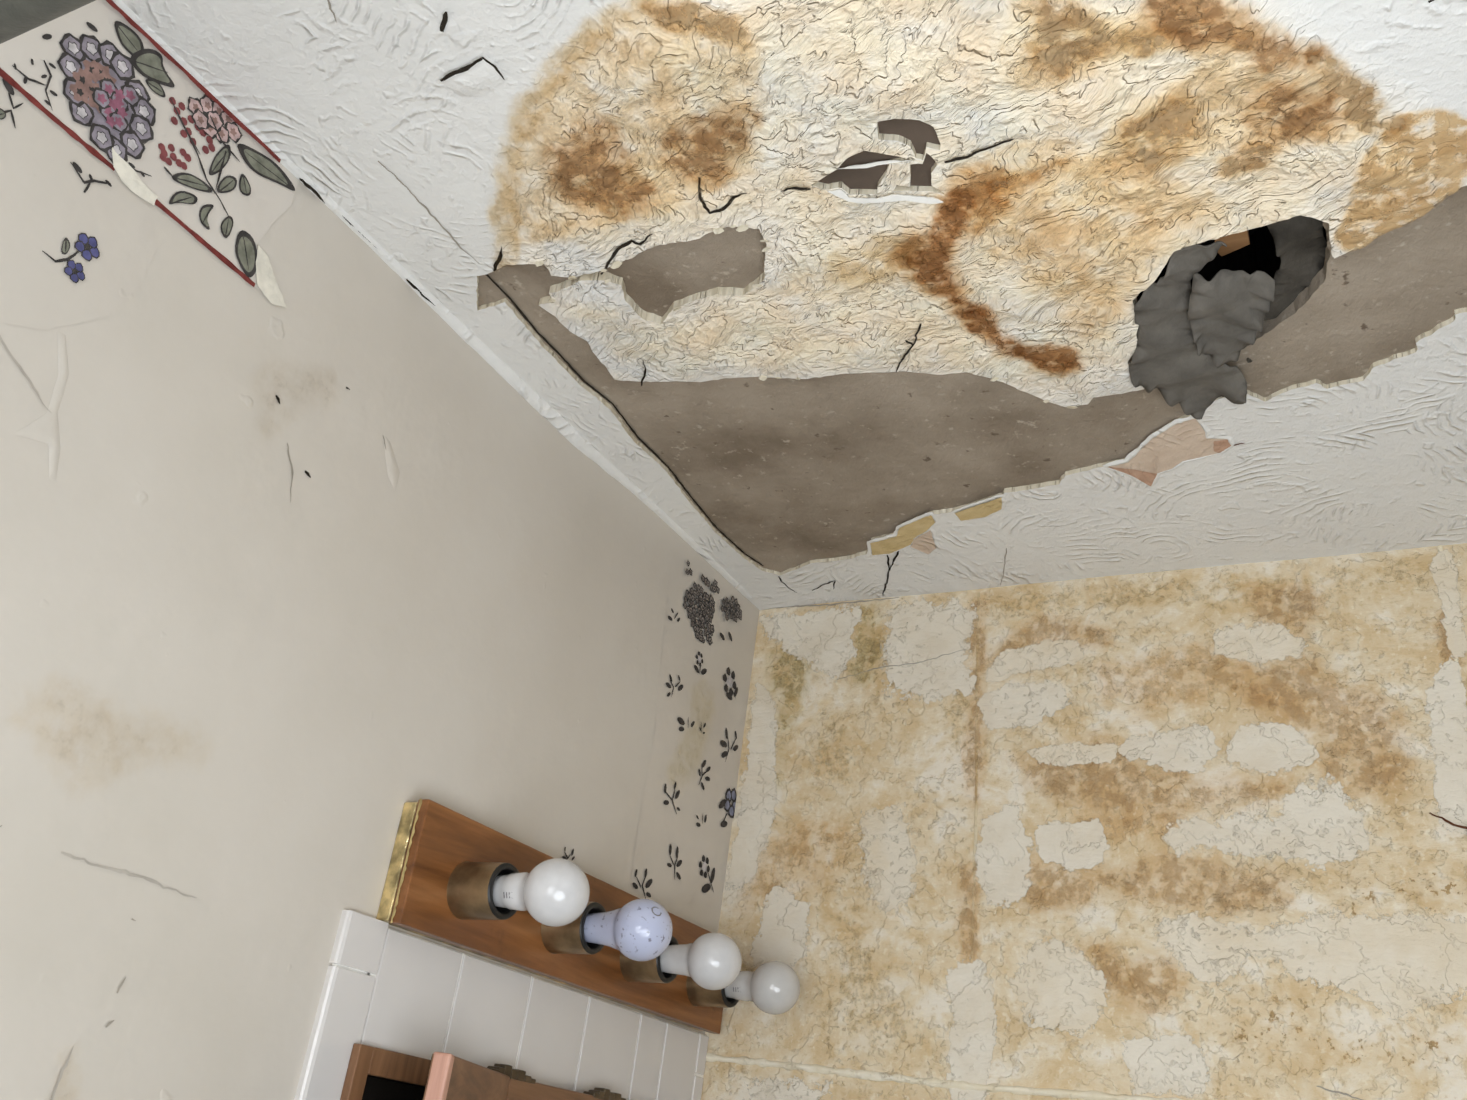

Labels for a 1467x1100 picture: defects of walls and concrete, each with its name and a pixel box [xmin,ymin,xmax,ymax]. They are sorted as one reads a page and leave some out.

damp [654,4,746,40]
damp [1038,7,1162,75]
damp [1310,56,1405,132]
flaking render [810,119,944,204]
damp [1223,146,1273,175]
spalling [1191,225,1281,287]
flaking render [1226,186,1467,401]
crack [896,324,921,372]
flaking render [476,225,1236,576]
crack [1429,813,1467,829]